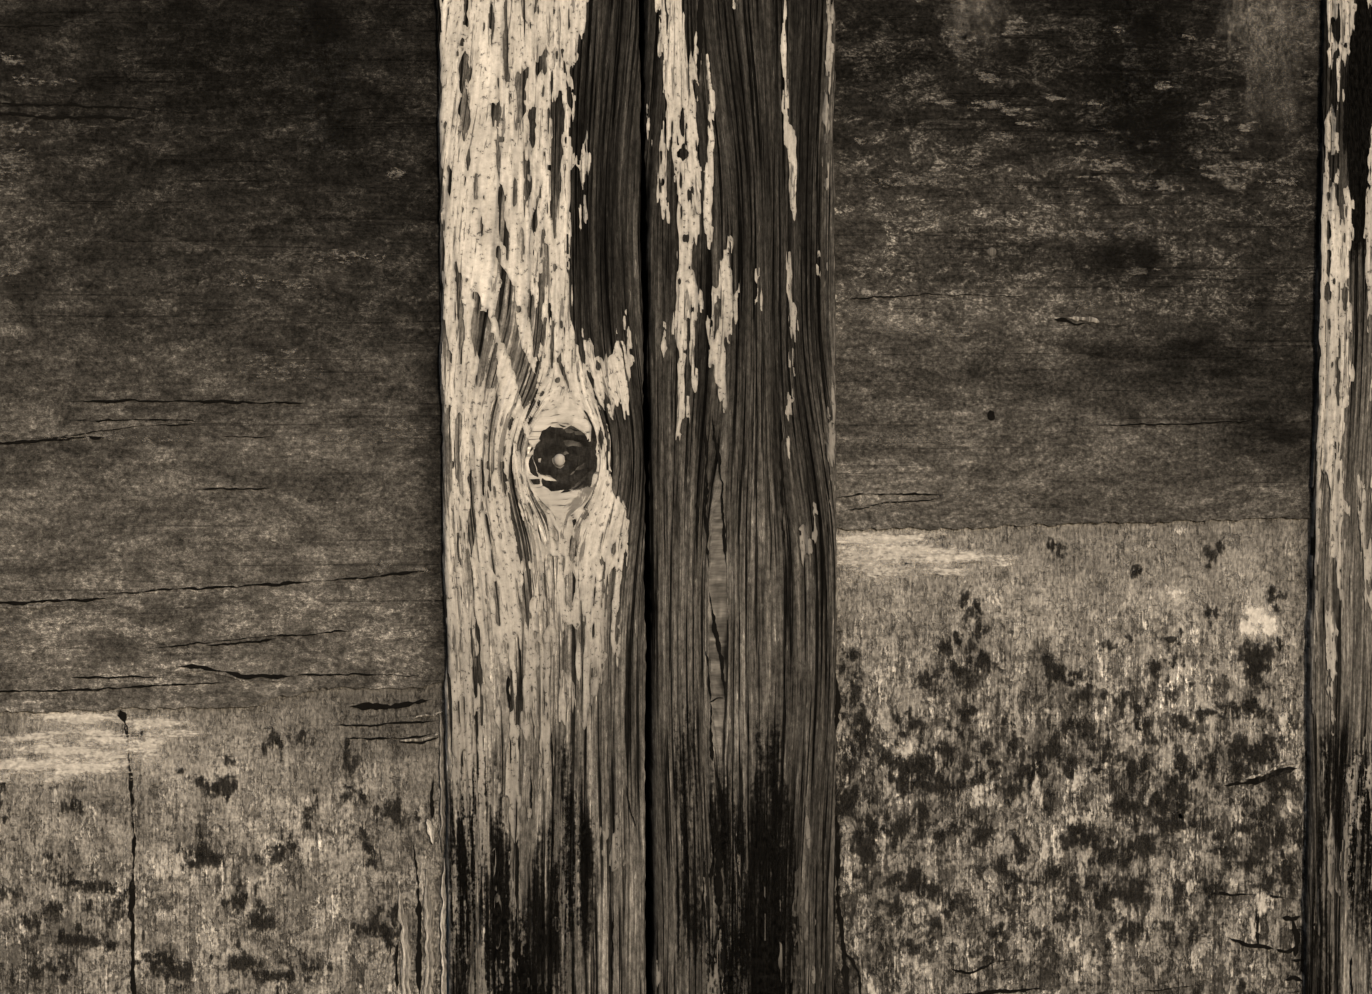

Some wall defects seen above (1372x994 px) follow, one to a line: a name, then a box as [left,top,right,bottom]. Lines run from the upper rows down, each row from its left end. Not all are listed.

peeling [646,0,763,441]
peeling [780,0,797,221]
crack [0,399,307,445]
crack [0,570,433,609]
crack [199,484,271,492]
peeling [439,0,634,994]
peeling [1311,0,1372,943]
water stain [0,853,136,986]
water stain [177,755,238,804]
crack [0,630,442,994]
water stain [209,880,333,994]
water stain [835,585,1372,994]